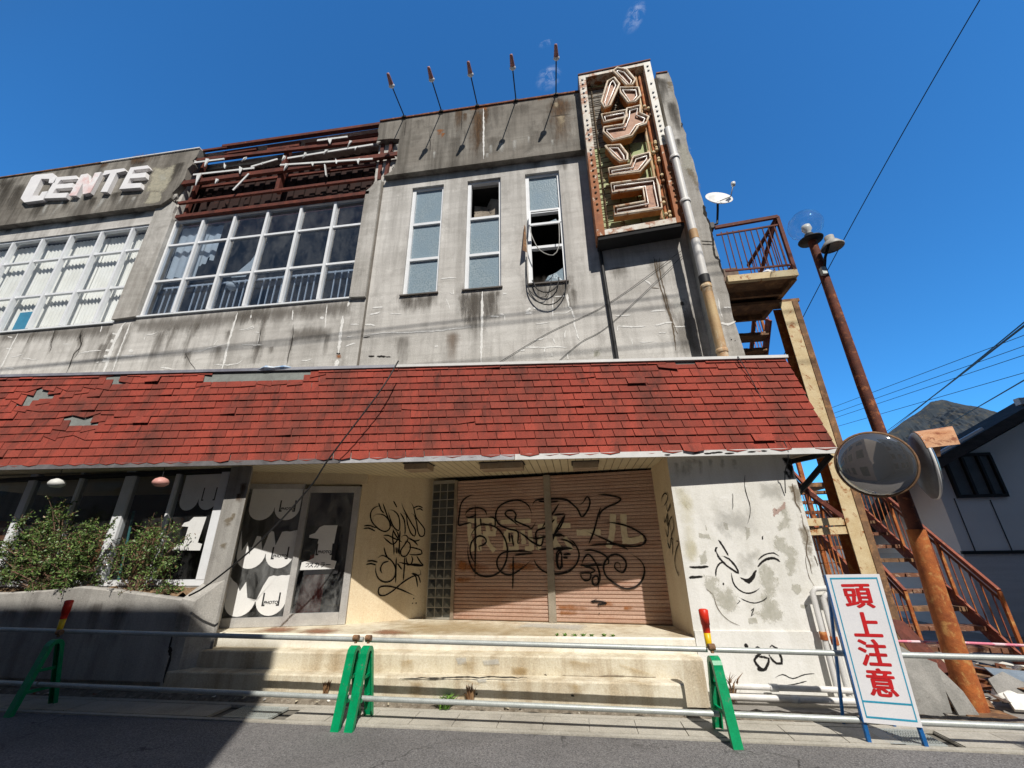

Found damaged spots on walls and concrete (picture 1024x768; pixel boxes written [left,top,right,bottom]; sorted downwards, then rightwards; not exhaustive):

water stain [140,305,345,342]
rust [792,300,843,447]
water stain [782,458,800,501]
rust [851,489,900,620]
crack [163,637,172,683]